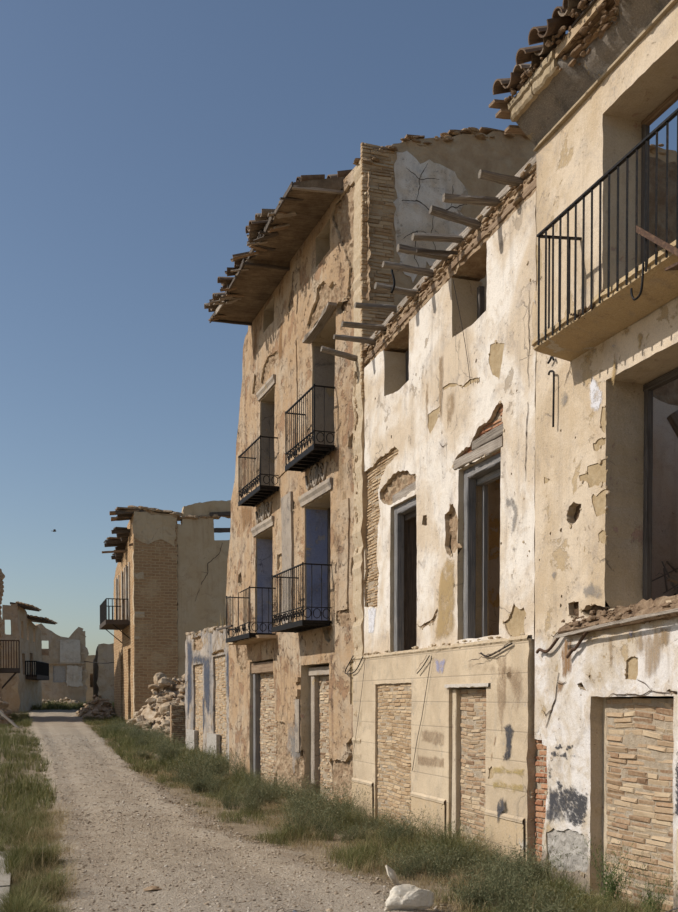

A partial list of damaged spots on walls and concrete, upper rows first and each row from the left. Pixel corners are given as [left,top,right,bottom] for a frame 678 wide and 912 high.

crack [402,163,467,277]
flaking render [488,340,504,378]
flaking render [478,400,505,438]
flaking render [351,367,416,607]
flaking render [580,405,610,516]
flaking render [449,504,464,557]
flaking render [326,607,358,640]
flaking render [502,606,526,636]